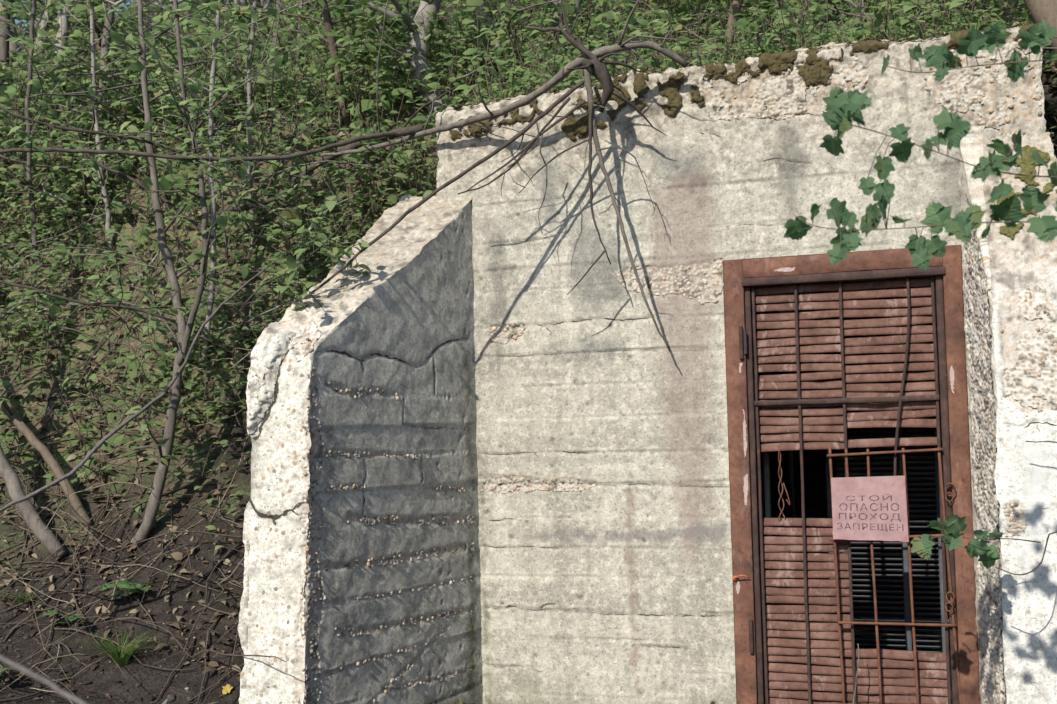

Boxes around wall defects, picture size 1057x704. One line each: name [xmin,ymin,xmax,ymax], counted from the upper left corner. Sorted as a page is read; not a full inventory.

spalling [614,258,724,304]
crack [253,321,480,440]
crack [249,499,308,525]